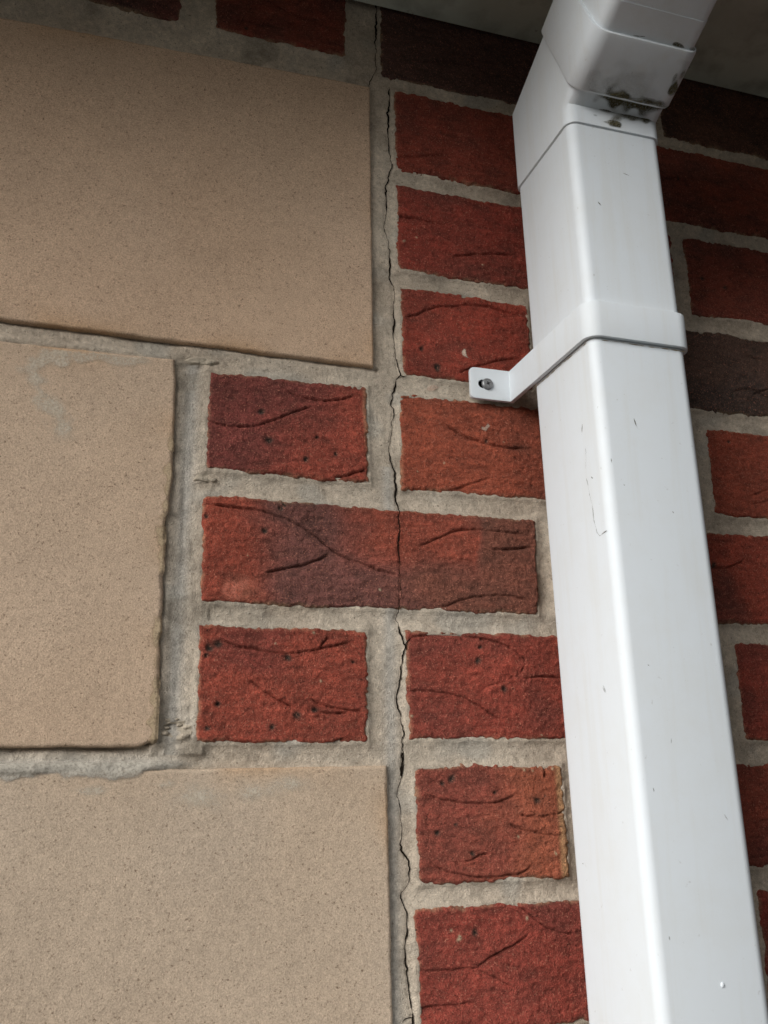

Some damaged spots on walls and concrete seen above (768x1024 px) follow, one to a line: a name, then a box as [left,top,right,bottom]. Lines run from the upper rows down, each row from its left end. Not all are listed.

crack [369,5,414,1024]